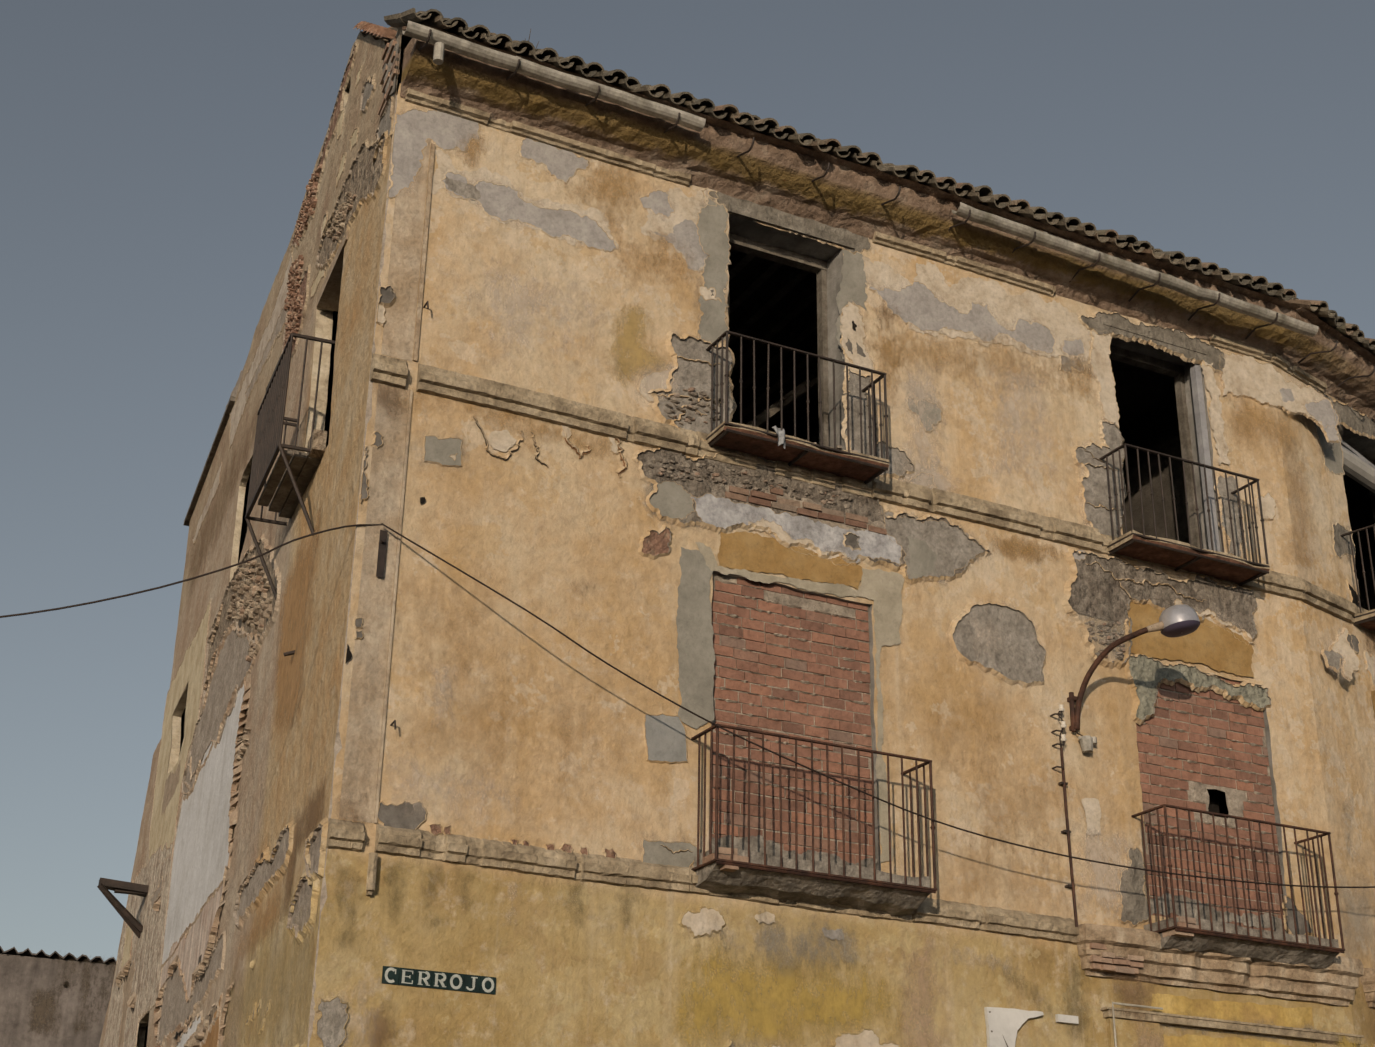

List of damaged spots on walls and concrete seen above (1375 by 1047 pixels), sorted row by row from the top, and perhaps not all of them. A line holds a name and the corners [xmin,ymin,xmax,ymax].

peeling [192,32,619,545]
spalling [632,187,992,589]
peeling [786,230,1375,537]
peeling [1214,474,1276,557]
peeling [1332,522,1355,559]
spalling [946,601,1046,688]
spalling [1062,548,1271,725]
peeling [1321,628,1375,717]
peeling [103,532,329,1047]
peeling [678,906,725,939]
peeling [294,995,349,1047]
peeling [835,1030,899,1047]